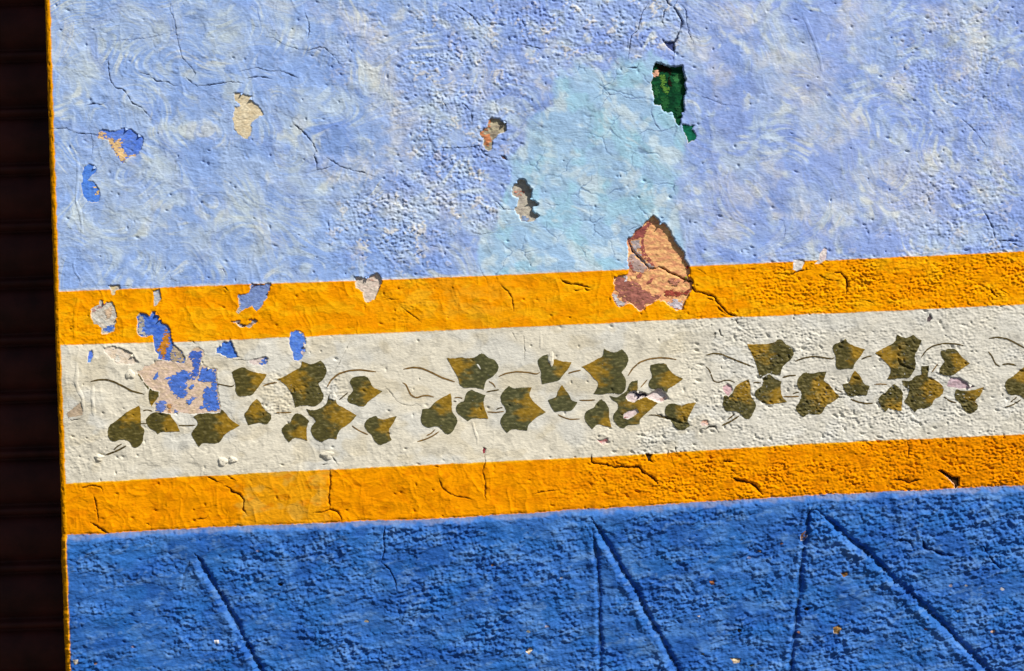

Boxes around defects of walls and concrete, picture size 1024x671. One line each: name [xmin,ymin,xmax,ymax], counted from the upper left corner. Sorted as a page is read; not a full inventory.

crack [89,3,295,114]
peeling [96,128,143,163]
peeling [232,93,263,139]
crack [295,125,375,177]
peeling [480,118,507,160]
flaking render [650,63,697,144]
flaking render [512,179,539,222]
peeling [612,216,694,311]
peeling [233,283,271,328]
peeling [355,273,382,302]
peeling [87,285,221,414]
peeling [288,331,306,361]